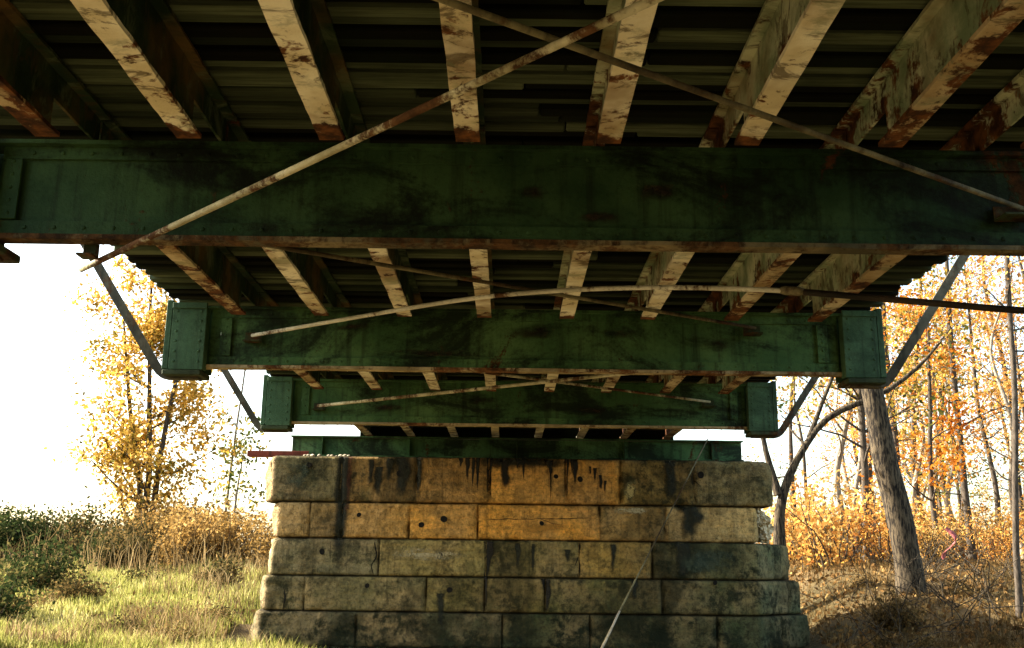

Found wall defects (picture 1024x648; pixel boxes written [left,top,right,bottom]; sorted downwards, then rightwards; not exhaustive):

leakage [334,457,352,553]
leakage [368,458,422,493]
leakage [459,456,607,497]
leakage [664,461,703,575]